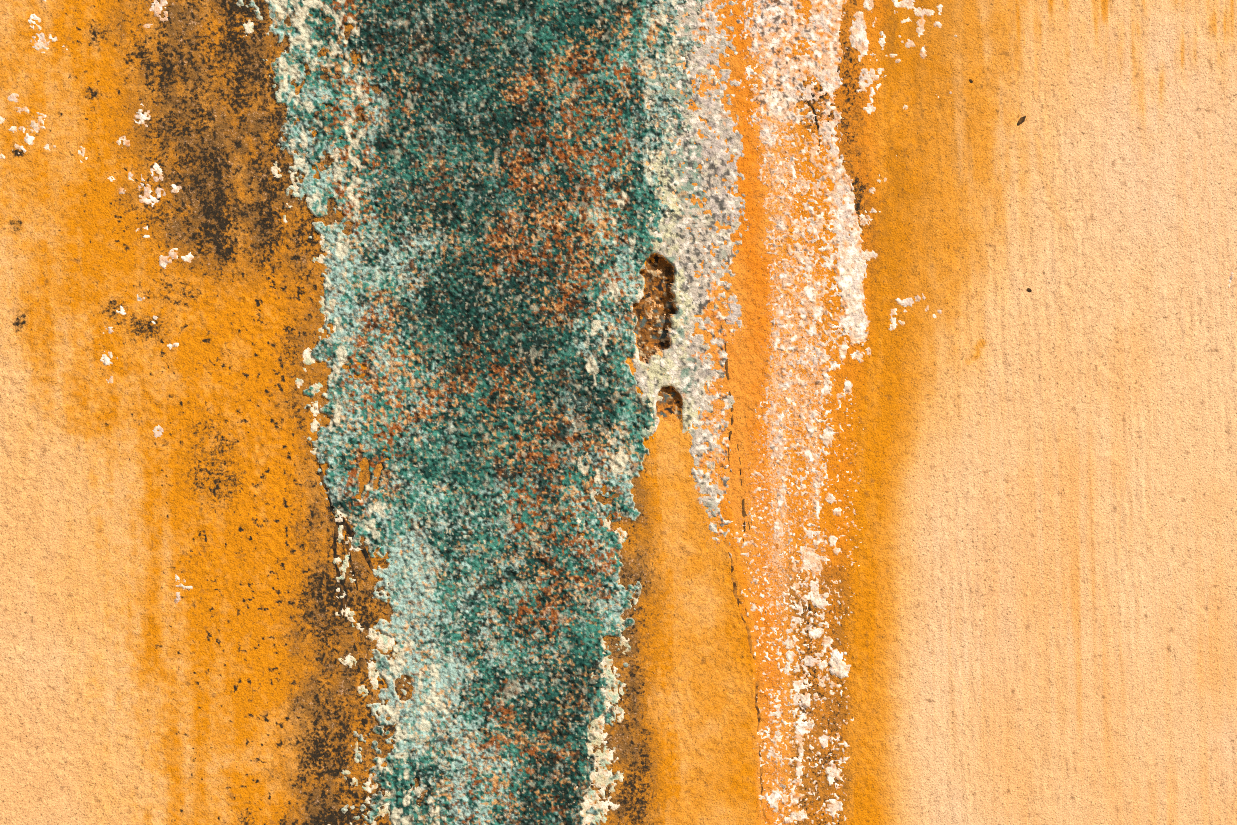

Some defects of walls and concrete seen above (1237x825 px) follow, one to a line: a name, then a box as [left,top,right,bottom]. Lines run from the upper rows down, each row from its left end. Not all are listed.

damp [0,0,413,825]
damp [406,778,428,806]
corrosion [664,0,761,512]
peeling [630,0,943,825]
corrosion [825,0,896,574]
damp [586,0,1237,825]